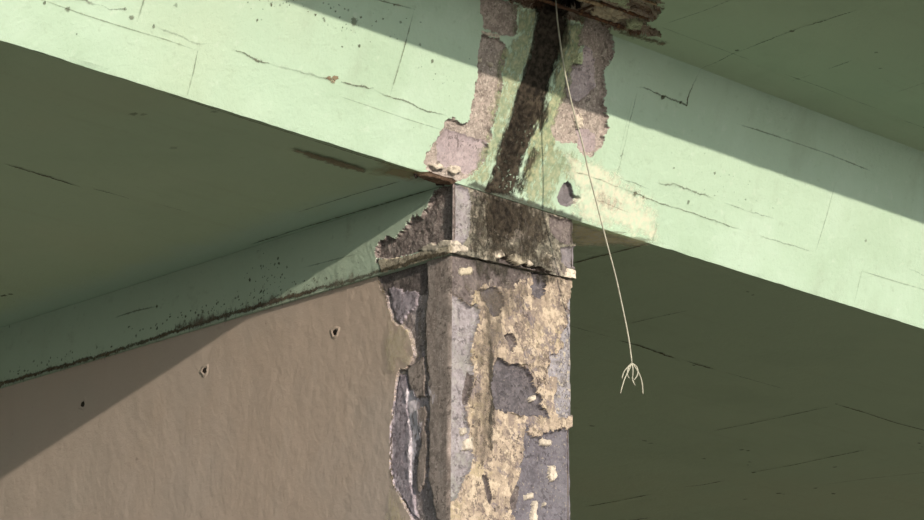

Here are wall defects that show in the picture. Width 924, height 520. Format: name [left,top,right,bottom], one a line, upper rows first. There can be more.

crack [343,82,436,113]
crack [646,88,692,106]
leakage [471,0,657,284]
corrosion [295,150,366,172]
peeling [374,0,665,520]
crack [622,341,709,368]
leakage [405,389,422,484]